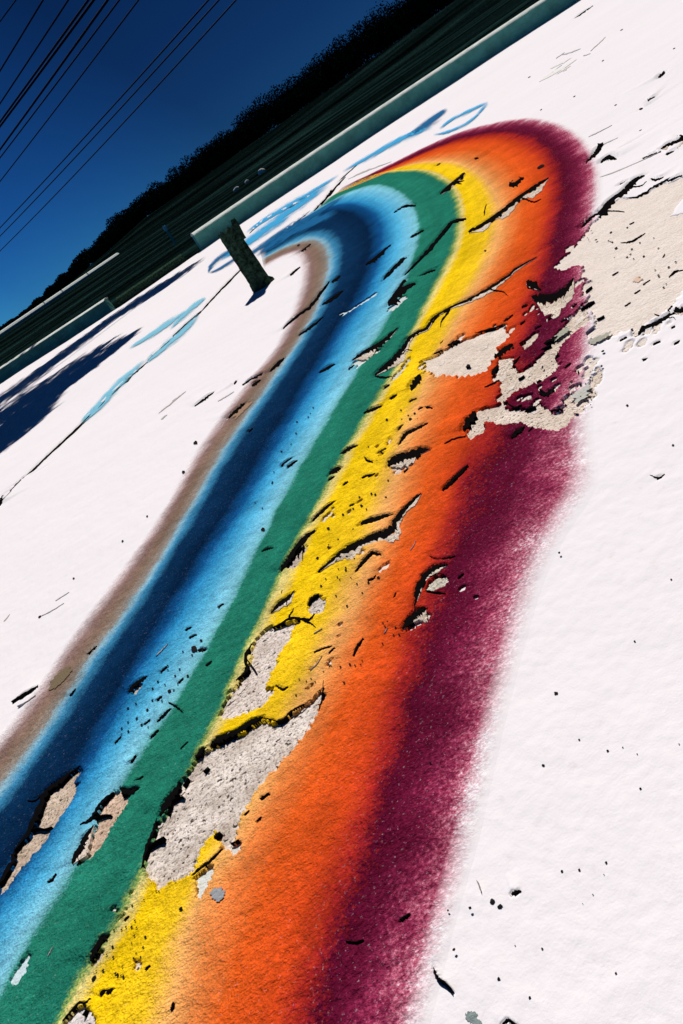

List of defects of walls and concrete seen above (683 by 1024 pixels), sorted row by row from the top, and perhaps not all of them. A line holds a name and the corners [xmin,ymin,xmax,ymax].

spalling [470,164,549,233]
crack [581,125,683,244]
peeling [376,178,683,440]
spalling [352,349,380,369]
spalling [387,449,431,481]
crack [141,177,683,875]
peeling [382,565,448,644]
peeling [221,622,300,720]
peeling [1,772,81,895]
peeling [73,792,130,865]
peeling [146,660,363,899]